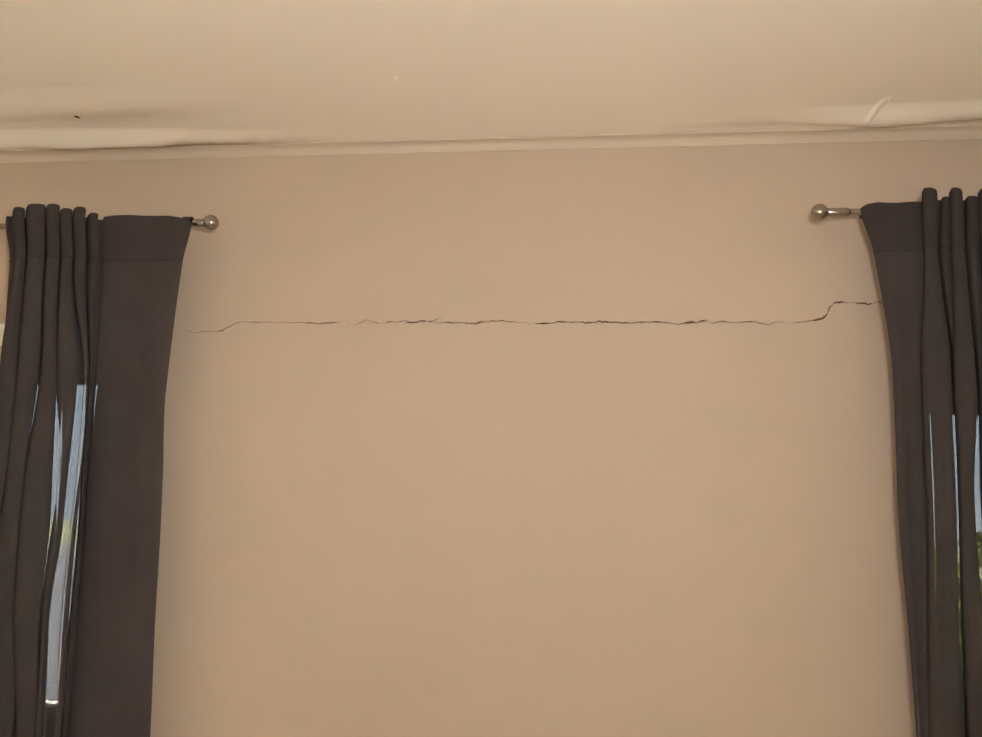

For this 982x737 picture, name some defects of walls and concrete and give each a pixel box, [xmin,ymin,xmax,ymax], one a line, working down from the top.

crack [185,301,880,333]